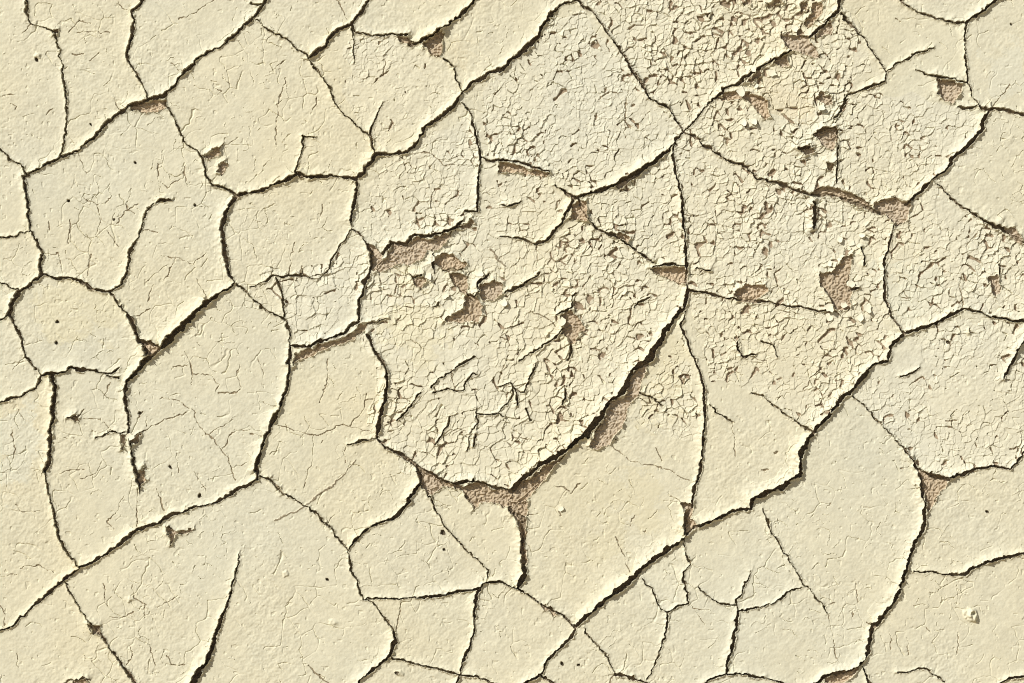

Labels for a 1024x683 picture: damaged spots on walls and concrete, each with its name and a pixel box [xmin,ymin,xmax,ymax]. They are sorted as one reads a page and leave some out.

crack [0,0,610,494]
crack [212,41,1024,683]
peeling [259,0,1024,565]
crack [809,0,933,182]
crack [900,0,1024,245]
crack [0,366,208,631]
crack [84,615,136,683]
crack [150,556,240,683]